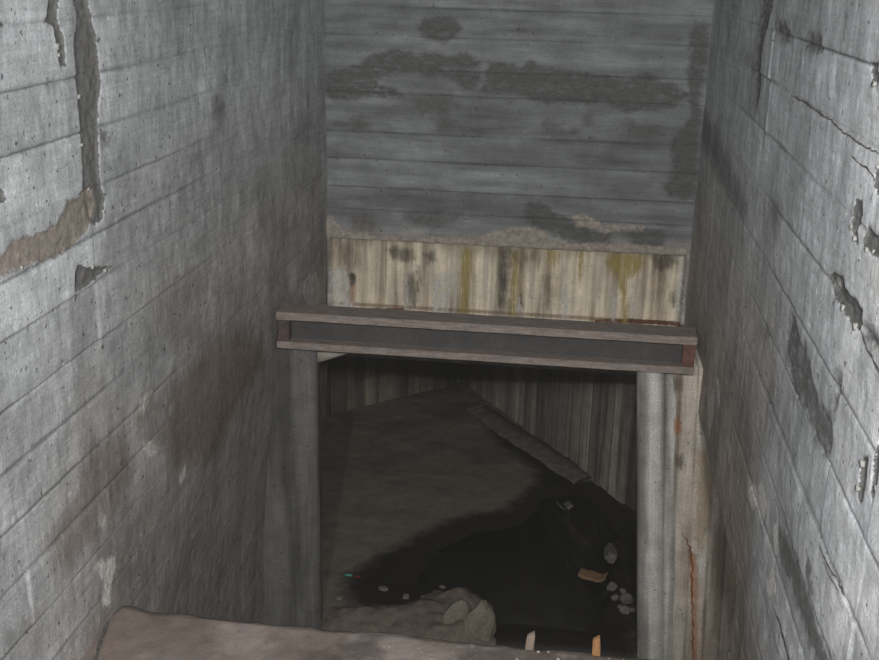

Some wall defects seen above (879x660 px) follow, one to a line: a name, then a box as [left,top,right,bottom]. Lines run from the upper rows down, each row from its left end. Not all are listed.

spalling [871,62,879,87]
spalling [0,0,109,278]
crack [791,95,878,182]
spalling [849,198,879,256]
spalling [75,264,112,293]
spalling [831,272,879,346]
crack [860,327,879,373]
spalling [855,446,879,503]
damp [773,518,827,660]